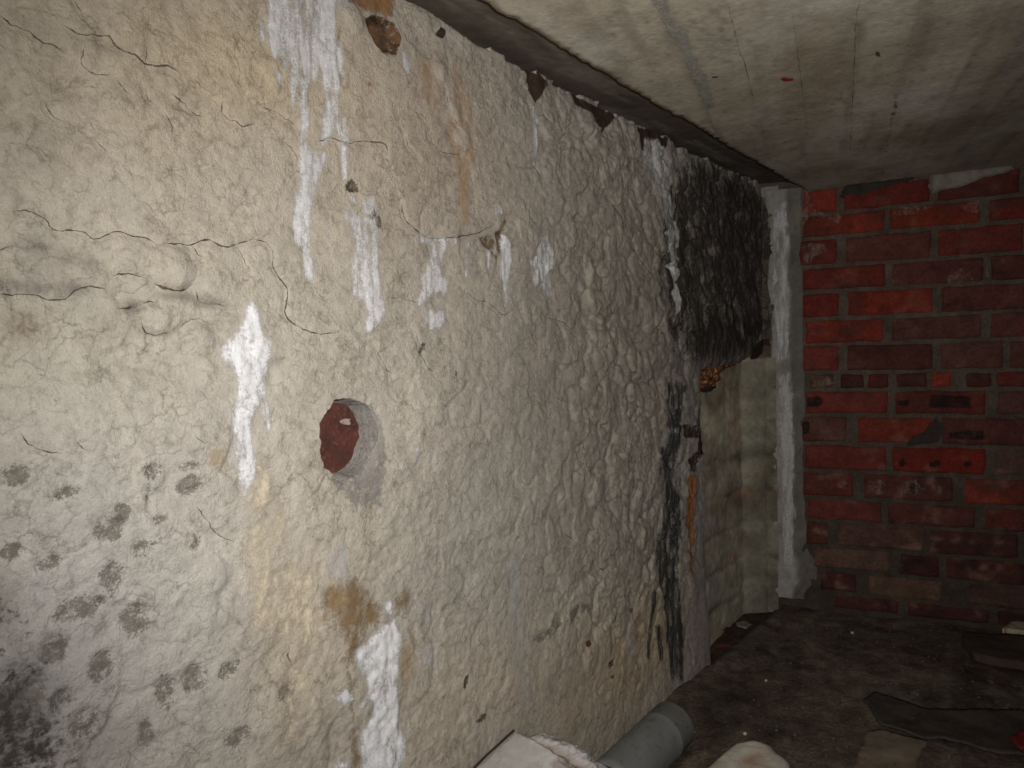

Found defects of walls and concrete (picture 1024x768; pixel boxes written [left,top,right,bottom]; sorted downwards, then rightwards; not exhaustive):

crack [1,2,460,165]
leakage [260,0,393,285]
flaking render [365,15,401,55]
crack [2,209,335,336]
leakage [344,194,385,333]
flaking render [319,402,359,473]
rust [700,361,742,392]
leakage [221,301,347,742]
leakage [647,384,686,681]
rust [686,475,697,580]
rust [324,582,379,658]
leakage [334,601,406,768]